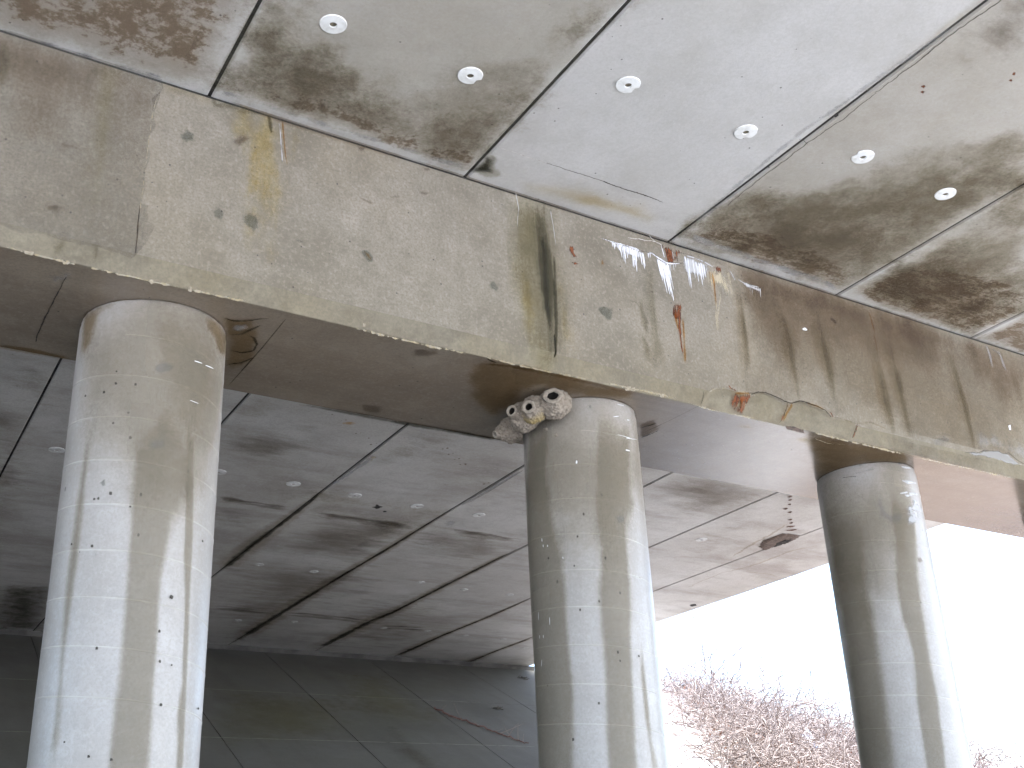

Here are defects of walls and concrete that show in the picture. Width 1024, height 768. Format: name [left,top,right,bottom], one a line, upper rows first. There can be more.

spalling [7,247,75,265]
spalling [92,267,244,301]
leakage [605,239,761,325]
spalling [357,323,462,353]
rust [673,305,683,353]
spalling [488,357,586,380]
spalling [610,383,670,398]
rust [729,386,750,413]
spalling [759,533,800,550]